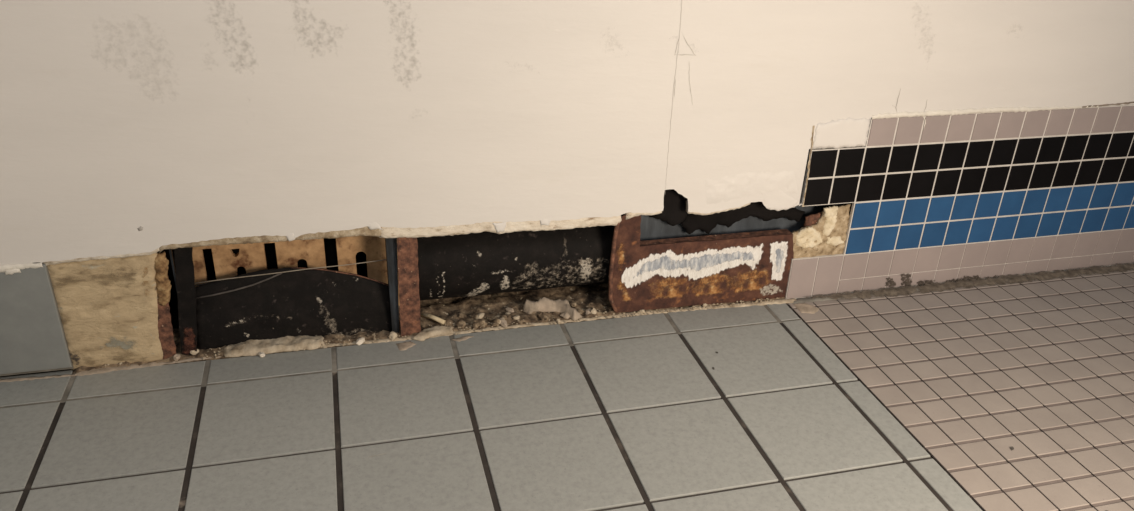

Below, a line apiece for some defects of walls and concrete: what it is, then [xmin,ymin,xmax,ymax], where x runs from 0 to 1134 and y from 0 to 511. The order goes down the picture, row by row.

spalling [686,200,750,215]
spalling [761,190,797,211]
peeling [791,204,851,258]
peeling [0,211,662,370]
corrosion [656,271,768,298]